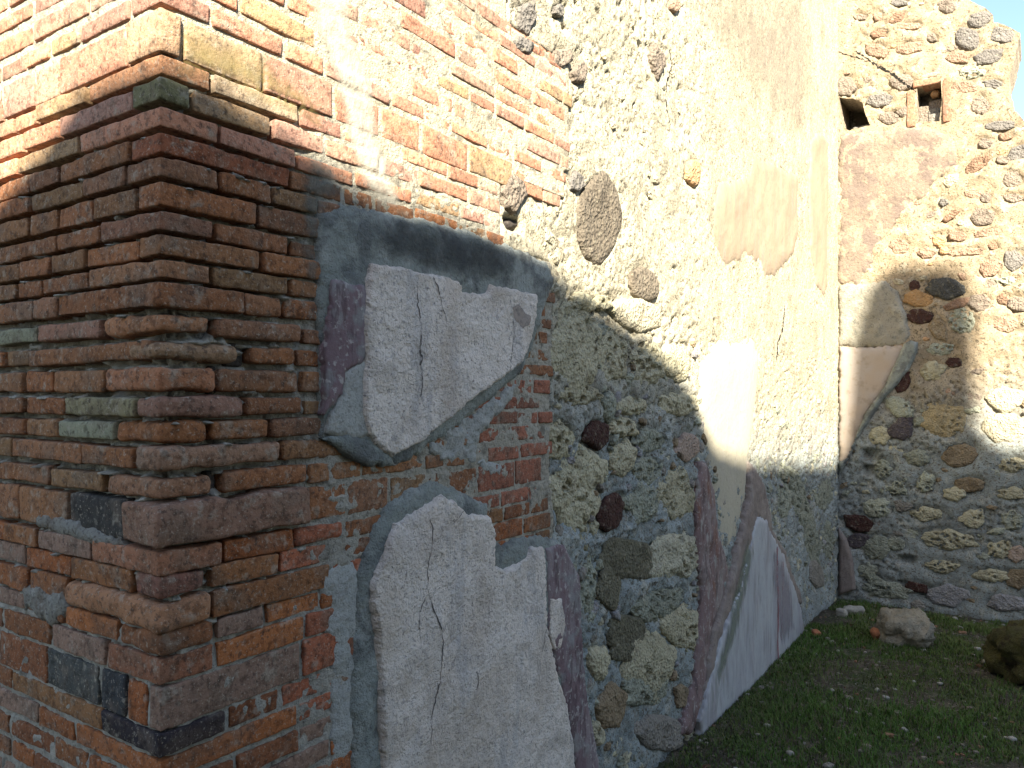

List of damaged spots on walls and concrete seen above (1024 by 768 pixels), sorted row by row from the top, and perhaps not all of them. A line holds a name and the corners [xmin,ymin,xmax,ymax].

crack [417,275,447,395]
peeling [313,203,554,467]
crack [419,508,464,738]